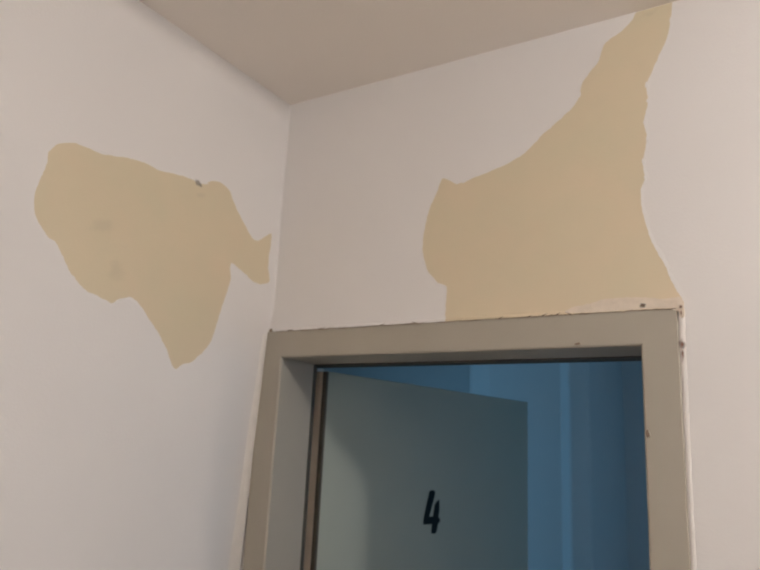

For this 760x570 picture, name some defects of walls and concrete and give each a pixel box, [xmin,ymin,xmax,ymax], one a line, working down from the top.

peeling [31,139,273,372]
peeling [420,3,686,319]